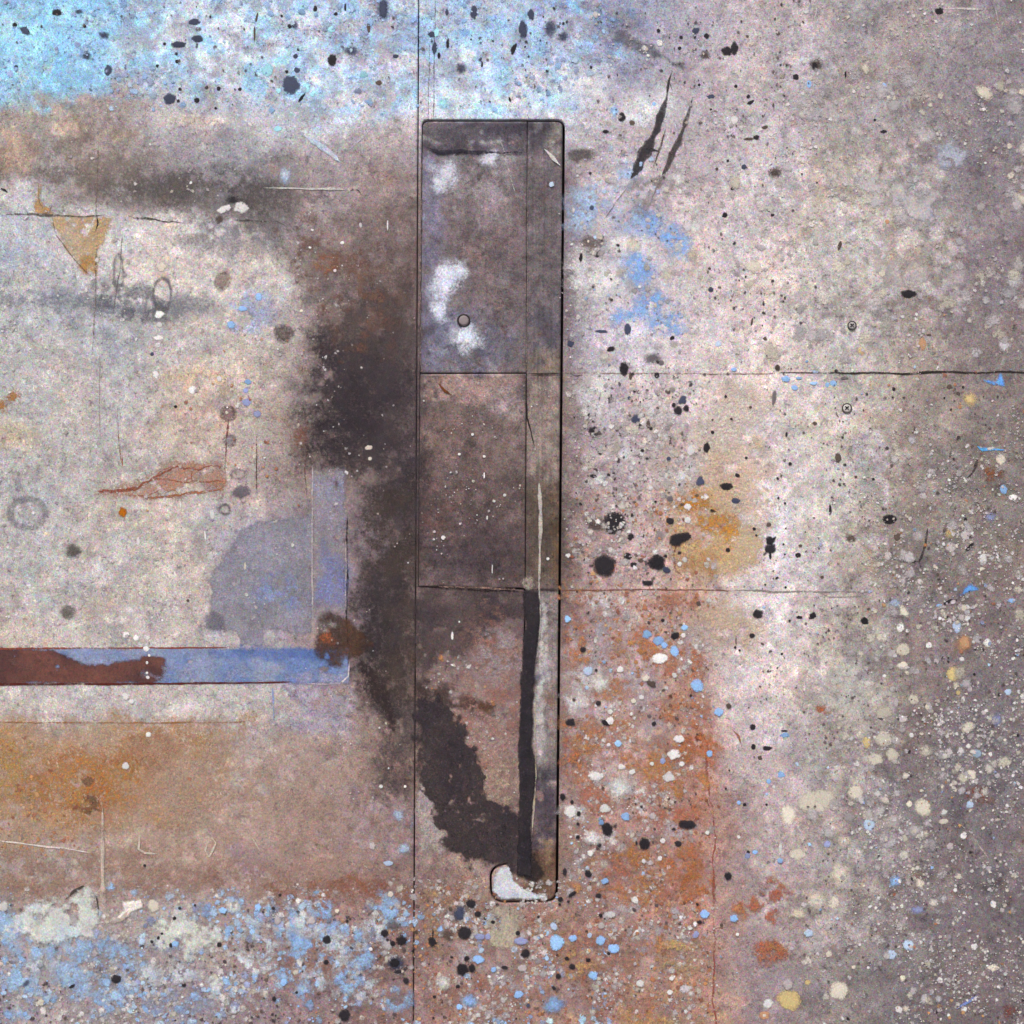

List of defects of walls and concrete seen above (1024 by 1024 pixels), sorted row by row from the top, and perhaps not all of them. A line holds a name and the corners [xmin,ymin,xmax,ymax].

leakage [274,326,293,341]
crack [516,371,1024,444]
leakage [293,284,429,798]
corrosion [0,383,794,1024]
leakage [517,853,544,881]